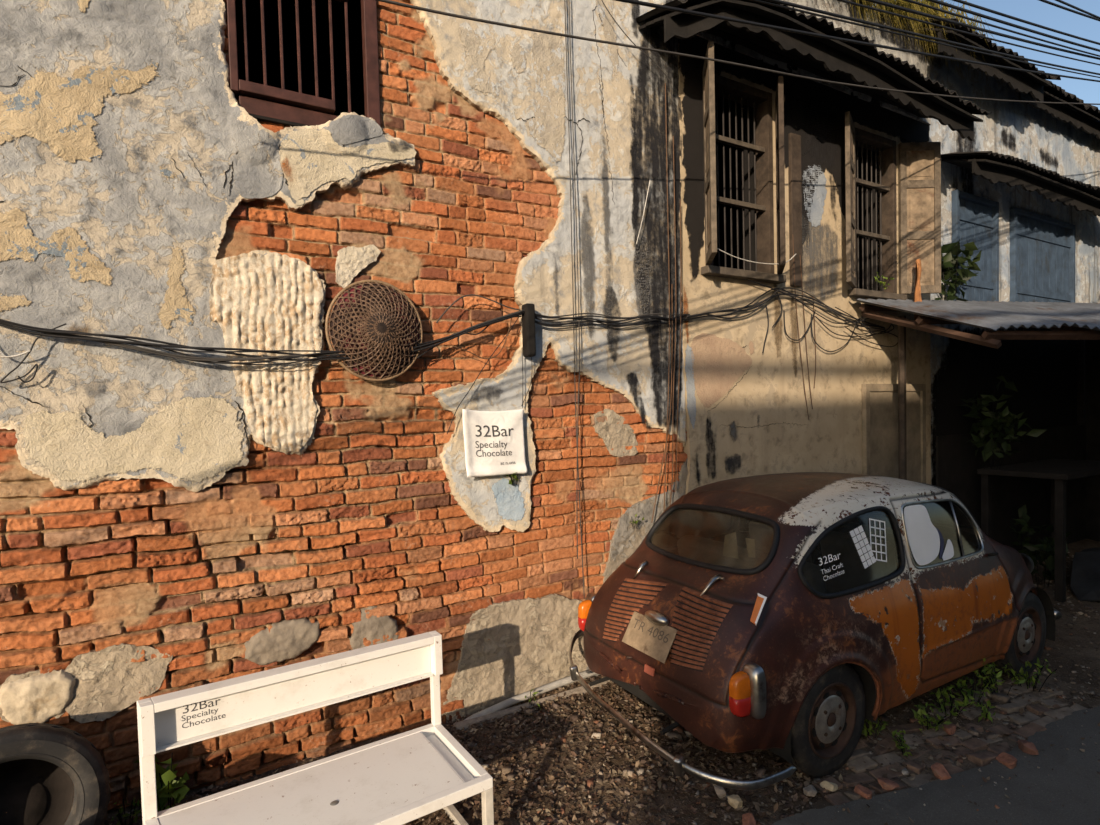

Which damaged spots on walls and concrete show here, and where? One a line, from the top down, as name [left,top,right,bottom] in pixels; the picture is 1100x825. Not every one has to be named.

spalling [0,0,755,811]
crack [566,7,626,202]
damp [627,4,930,428]